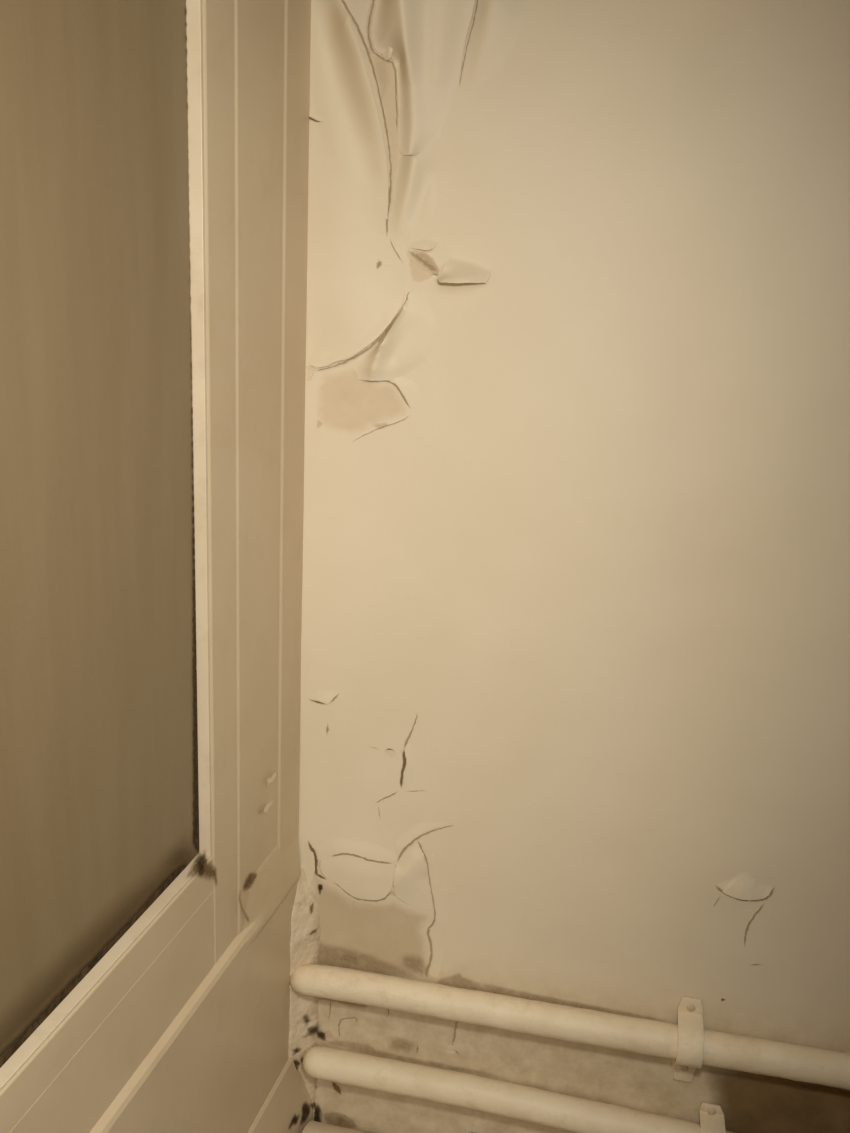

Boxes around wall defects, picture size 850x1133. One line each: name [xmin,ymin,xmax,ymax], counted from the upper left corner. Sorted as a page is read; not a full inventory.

peeling [312,0,526,258]
peeling [306,281,438,440]
crack [307,689,338,732]
crack [378,717,423,817]
flaking render [303,821,451,977]
damp [318,945,423,974]
damp [305,1016,354,1045]
damp [290,1102,354,1127]
damp [721,1074,850,1133]